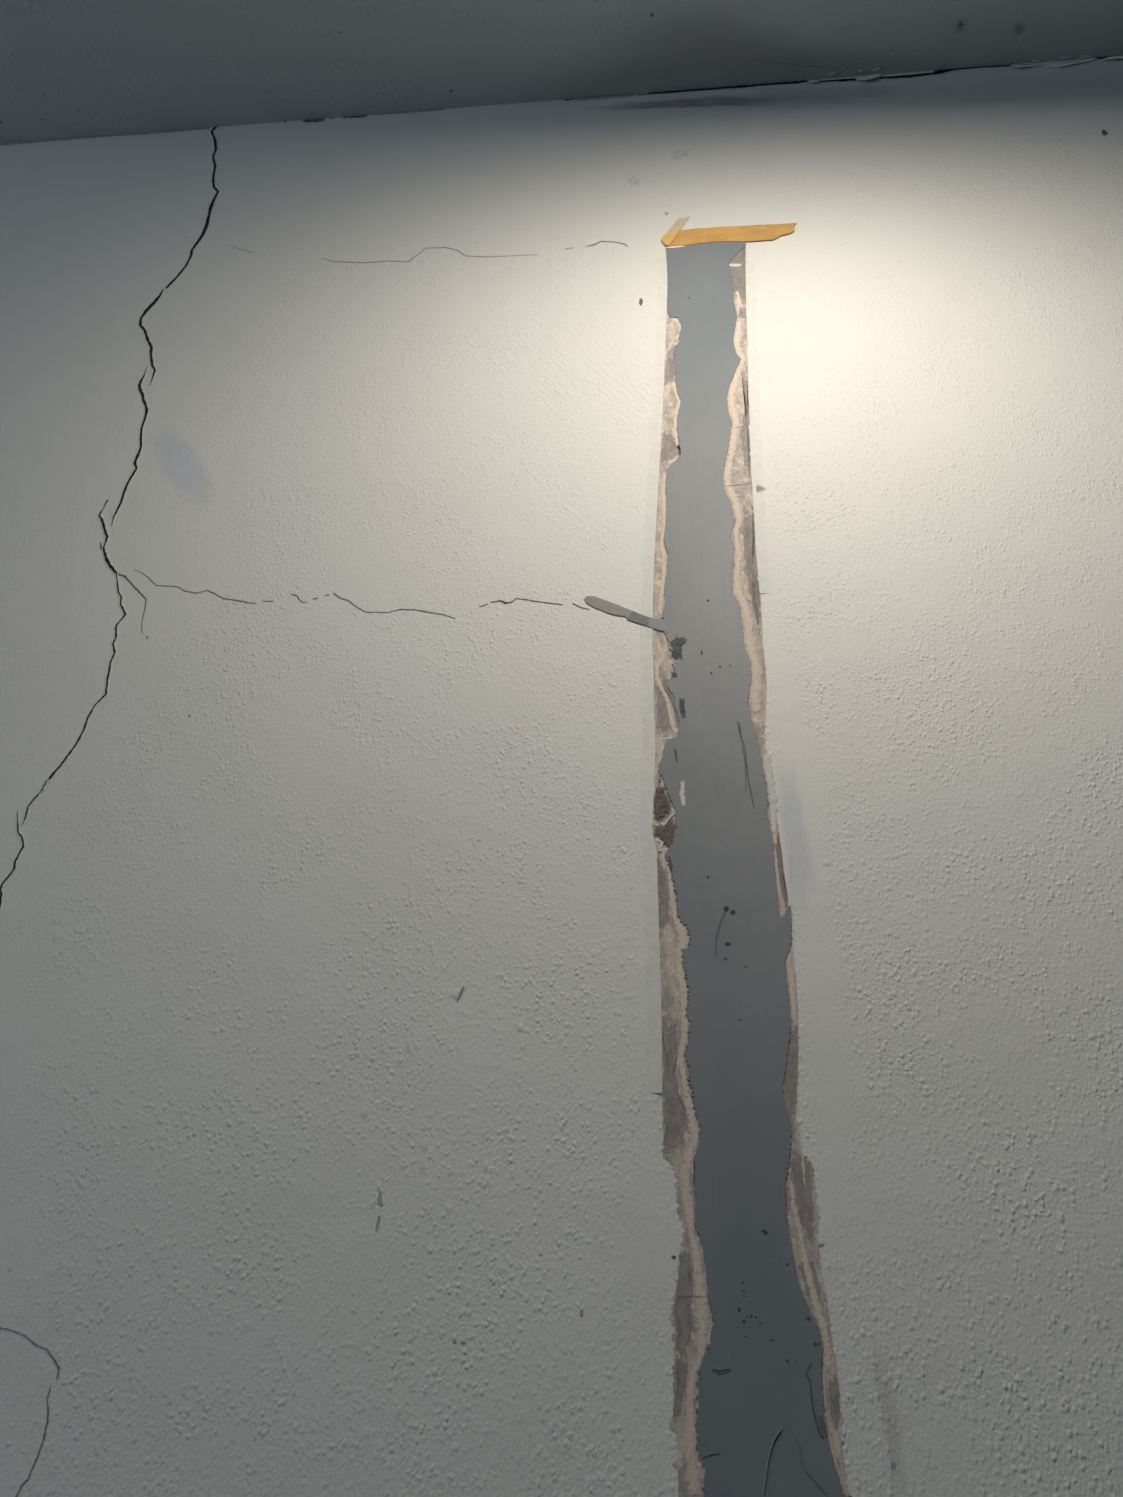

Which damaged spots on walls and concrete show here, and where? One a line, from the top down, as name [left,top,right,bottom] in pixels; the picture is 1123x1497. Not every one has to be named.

crack [284,109,444,123]
crack [564,55,1123,101]
crack [0,126,628,915]
peeling [722,247,788,918]
peeling [639,246,715,1497]
crack [0,1327,59,1497]
peeling [783,938,852,1497]